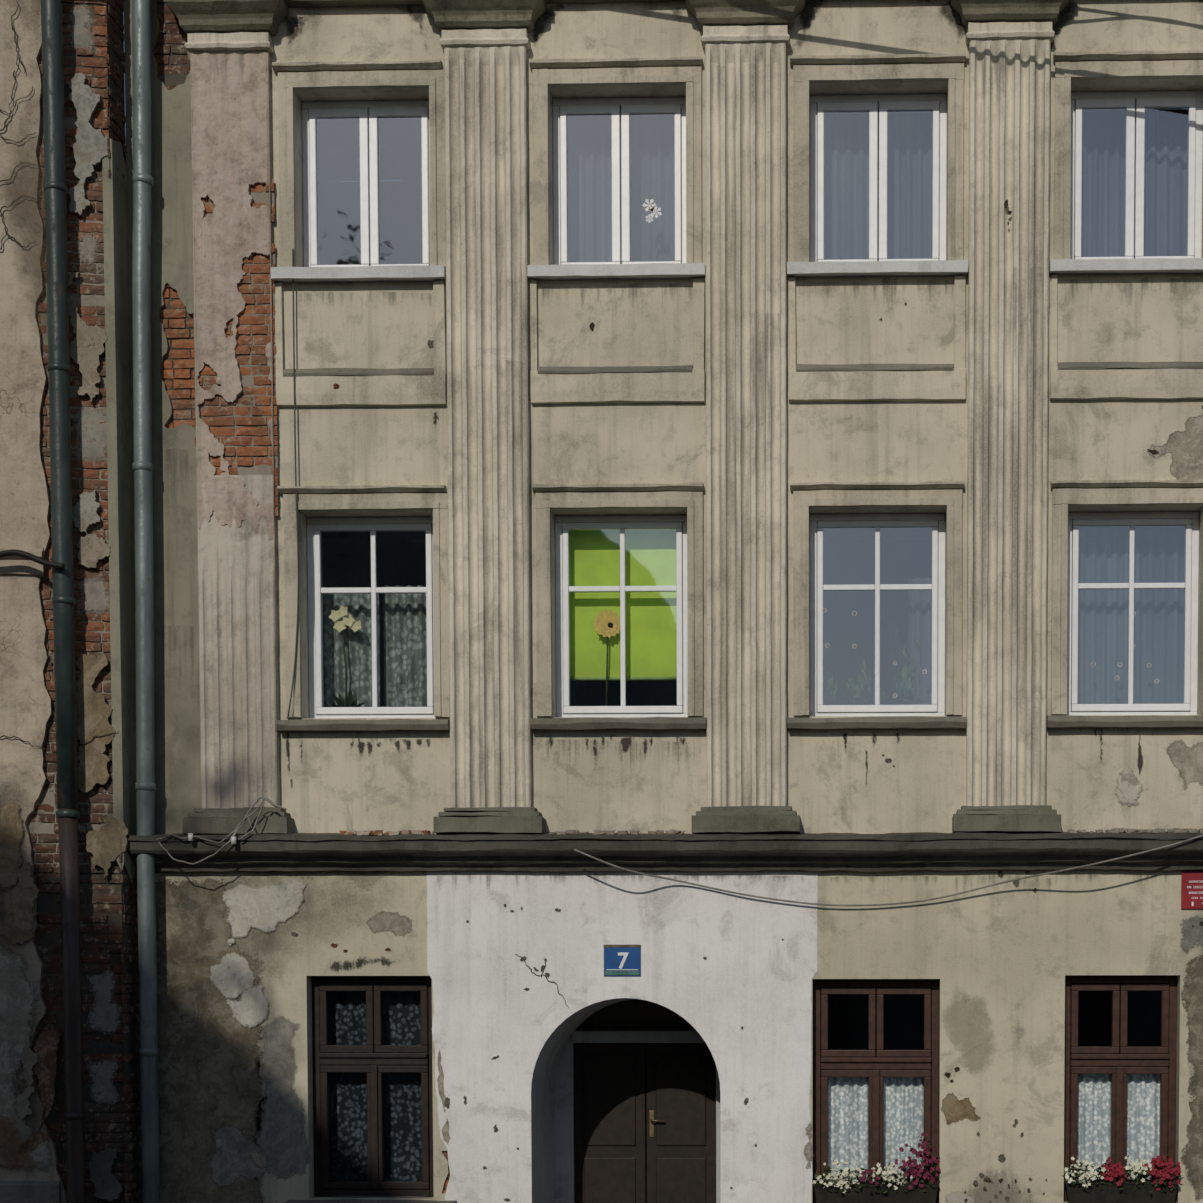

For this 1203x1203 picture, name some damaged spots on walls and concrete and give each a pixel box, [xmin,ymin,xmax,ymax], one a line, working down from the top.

crack [0,1,38,250]
peeling [68,73,108,217]
peeling [68,272,107,404]
spalling [159,243,279,516]
flaking render [1147,405,1203,480]
peeling [72,489,111,569]
peeling [85,814,129,879]
flaking render [0,858,60,1170]
flaking render [155,878,311,1203]
crack [515,954,569,1008]
spalling [941,1067,980,1136]
flaking render [1180,916,1203,1201]